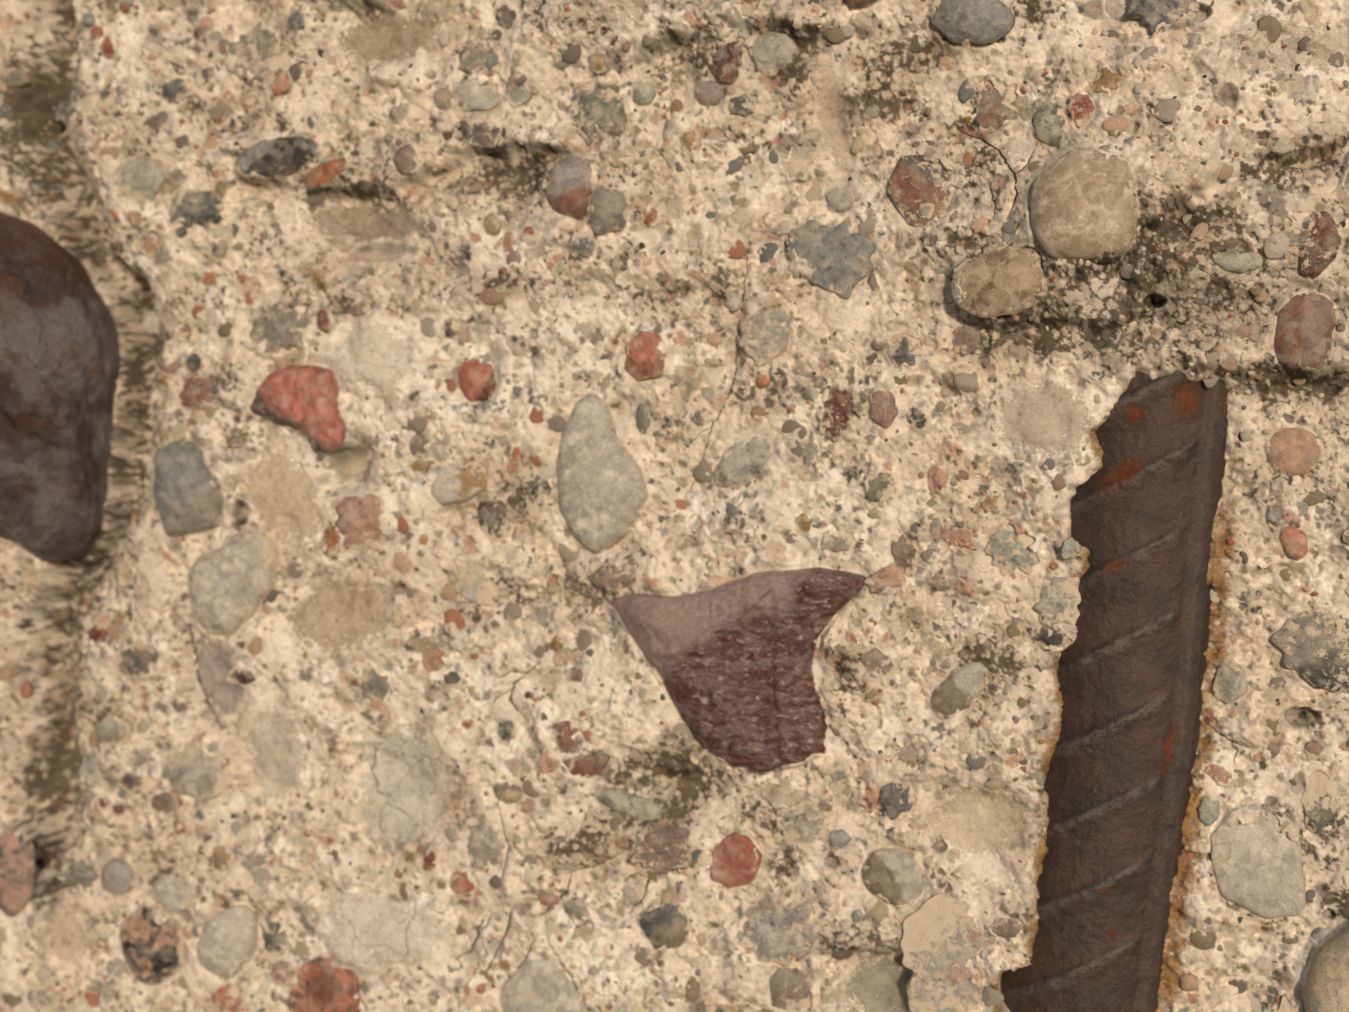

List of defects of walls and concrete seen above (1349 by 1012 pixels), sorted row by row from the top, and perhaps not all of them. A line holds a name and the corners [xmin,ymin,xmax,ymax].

rust [1089,425,1146,491]
spalling [995,370,1229,1012]
crack [371,740,436,832]
spalling [927,782,1028,860]
rust [1035,823,1048,883]
rust [1040,722,1061,778]
rust [1156,501,1235,1012]